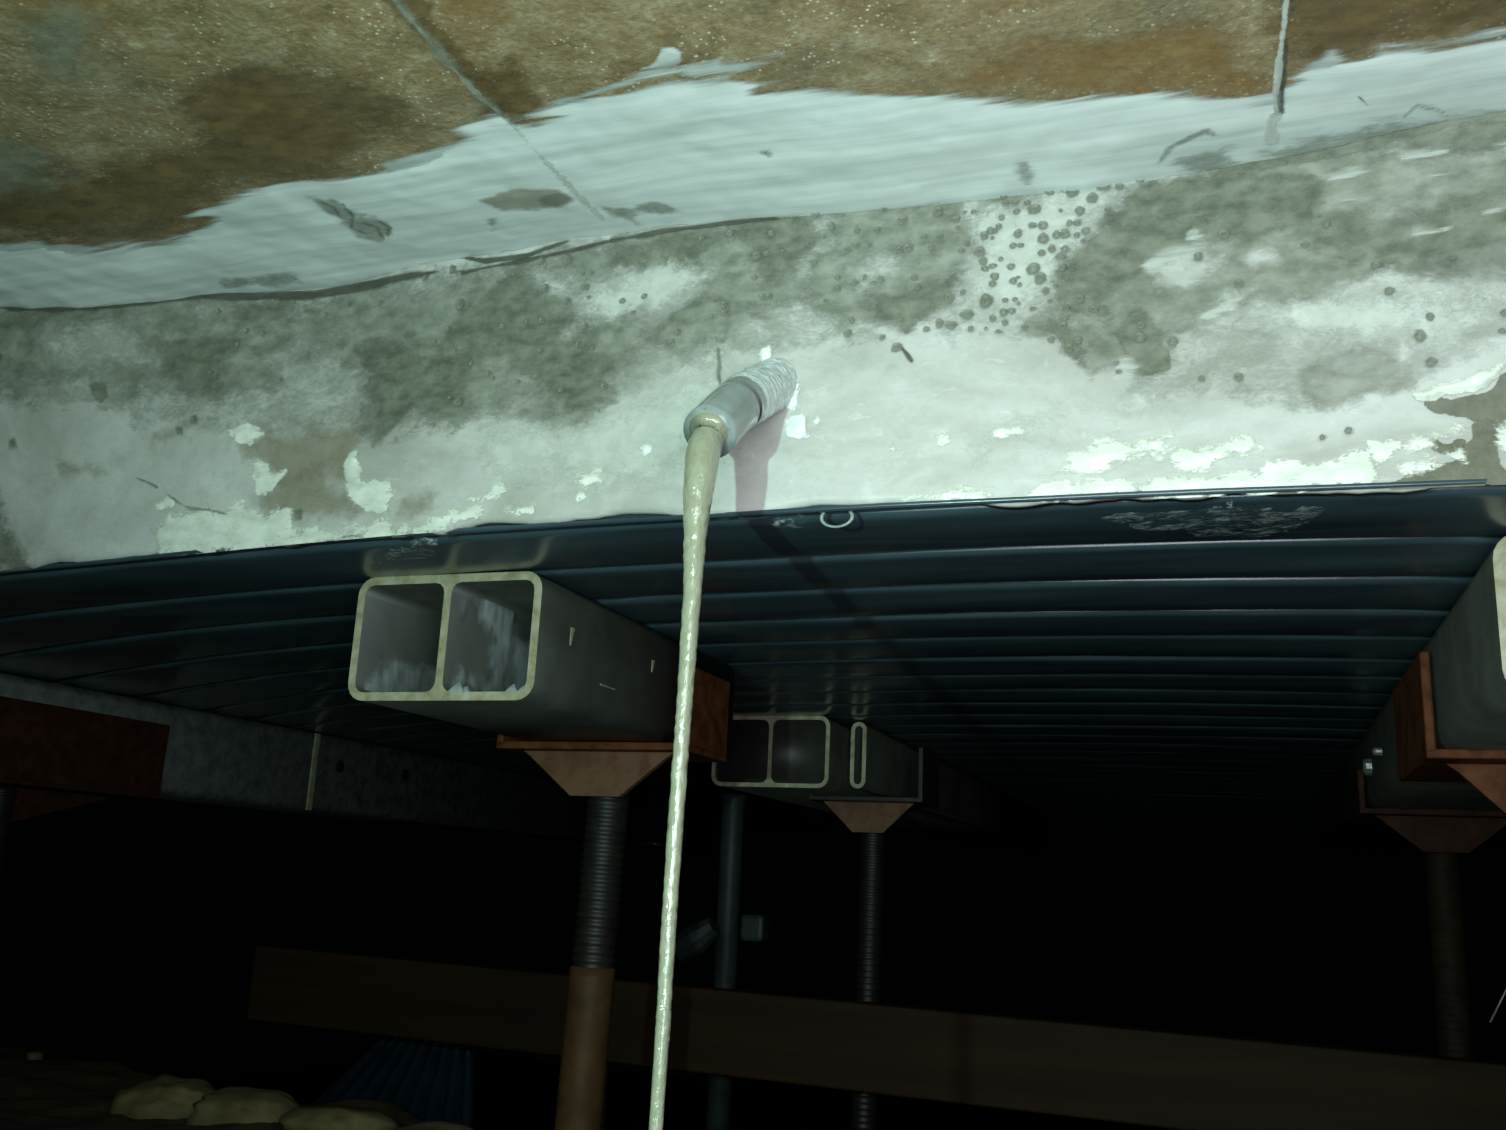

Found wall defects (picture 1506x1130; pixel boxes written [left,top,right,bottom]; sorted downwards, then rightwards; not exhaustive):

corrosion [1276,0,1506,59]
corrosion [482,61,540,119]
damp [554,60,762,104]
crack [1229,0,1506,170]
damp [384,148,454,171]
spalling [896,179,1144,353]
damp [1025,121,1506,375]
damp [0,195,1028,512]
peeling [228,423,287,496]
peeling [343,449,395,520]
peeling [785,413,820,439]
peeling [1026,357,1506,503]